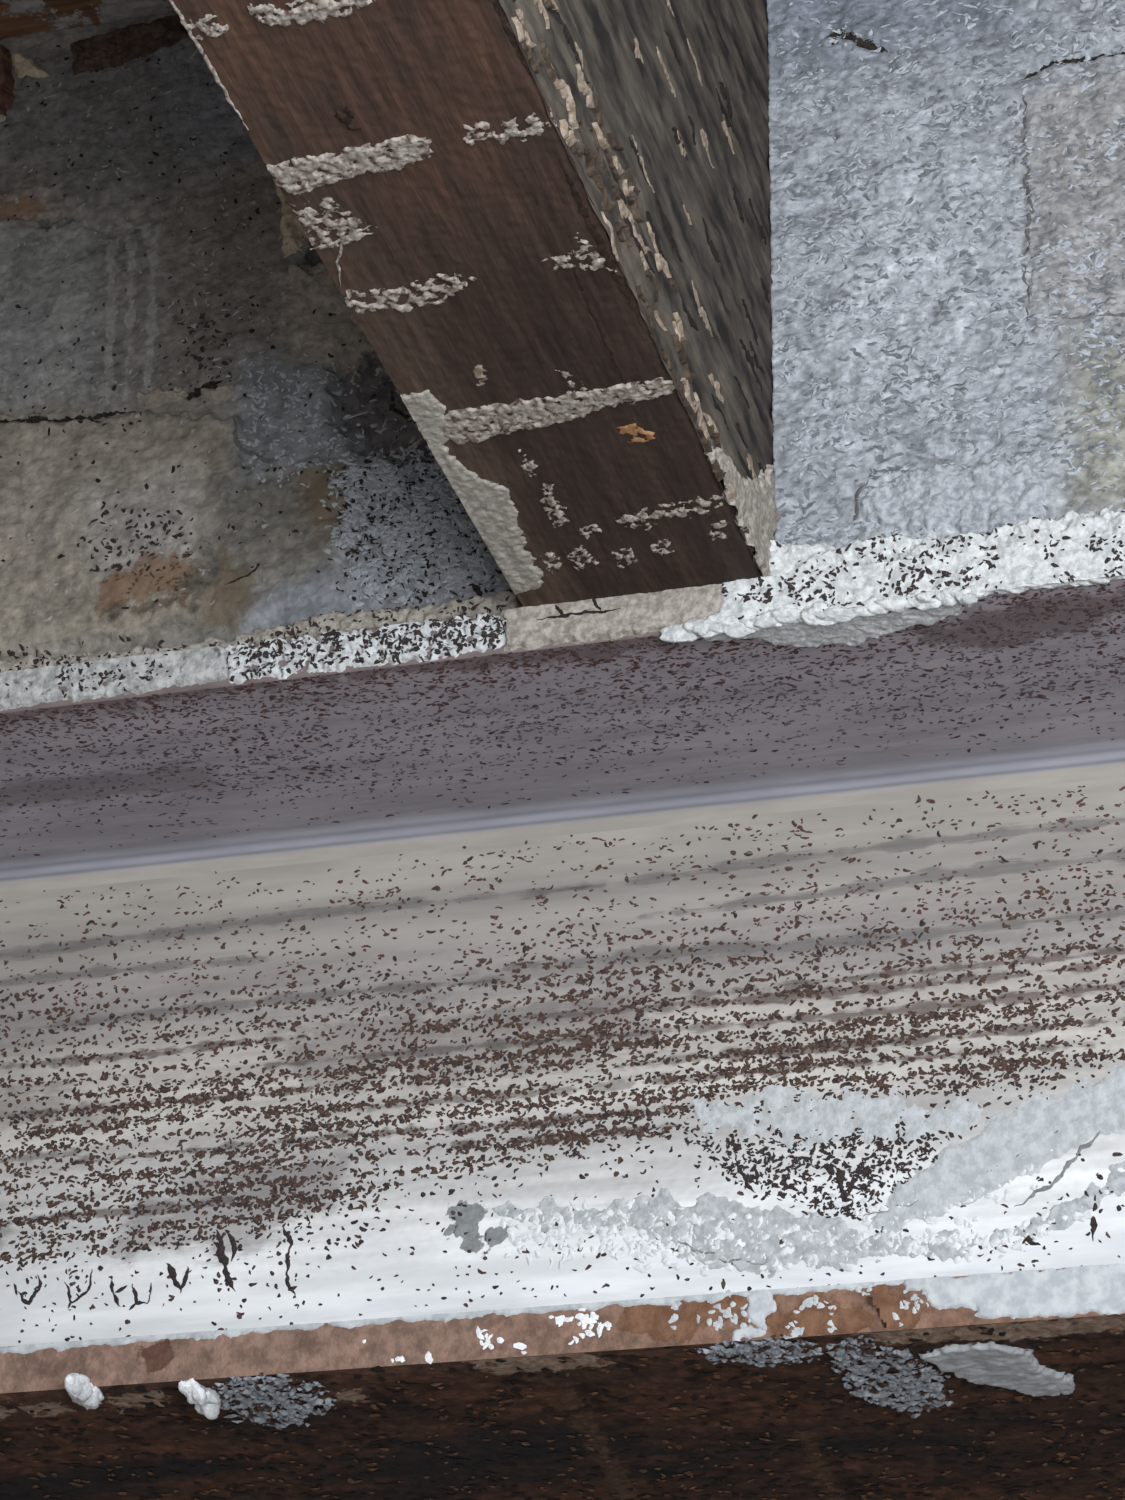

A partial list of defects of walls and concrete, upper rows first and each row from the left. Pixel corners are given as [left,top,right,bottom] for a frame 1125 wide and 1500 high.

flaking render [0,15,189,160]
crack [1017,51,1125,337]
spalling [10,304,93,414]
crack [0,411,136,423]
peeling [0,1164,1125,1500]